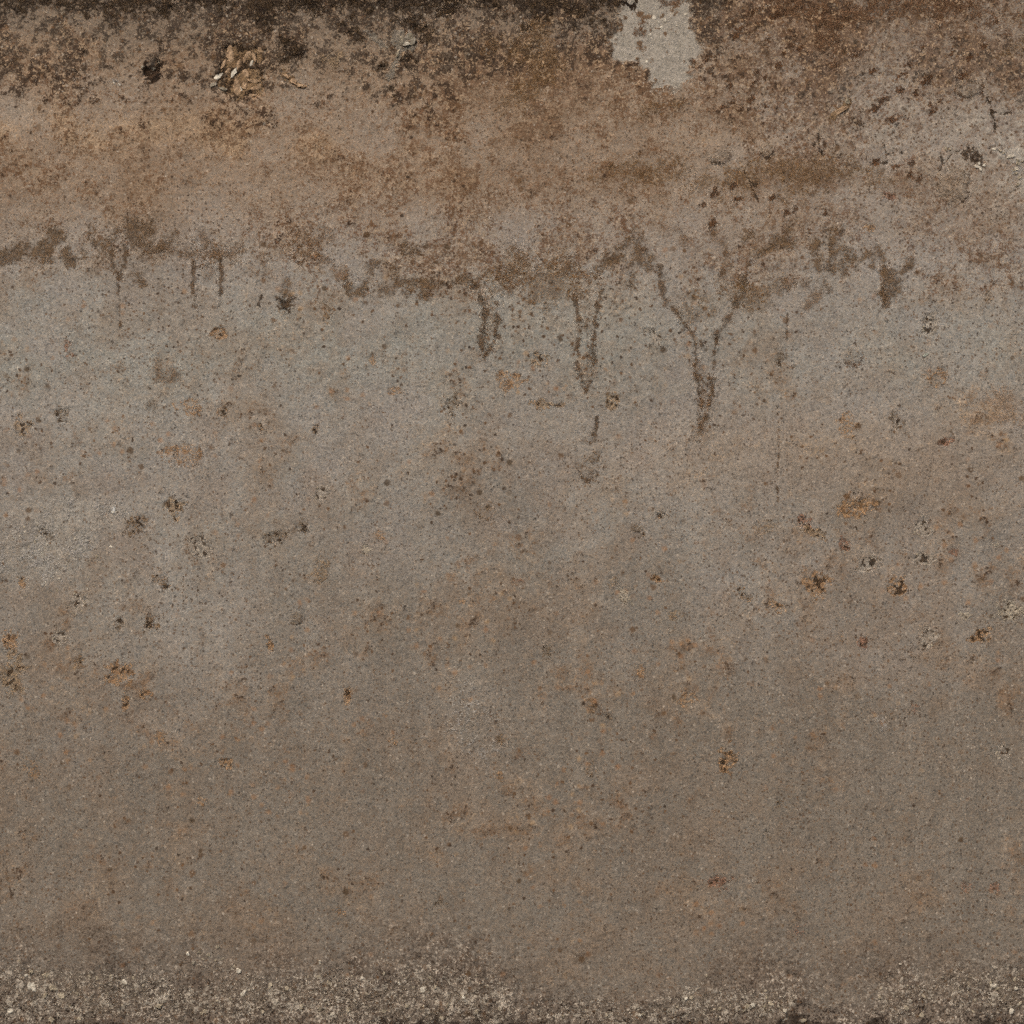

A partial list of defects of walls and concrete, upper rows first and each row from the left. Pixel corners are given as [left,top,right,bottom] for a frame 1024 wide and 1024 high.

water stain [275,30,307,67]
water stain [376,54,417,74]
water stain [397,18,436,45]
peeling [604,0,781,94]
spalling [720,35,805,112]
water stain [0,217,178,288]
water stain [276,278,296,315]
water stain [342,241,501,357]
water stain [572,221,797,442]
water stain [809,227,914,308]